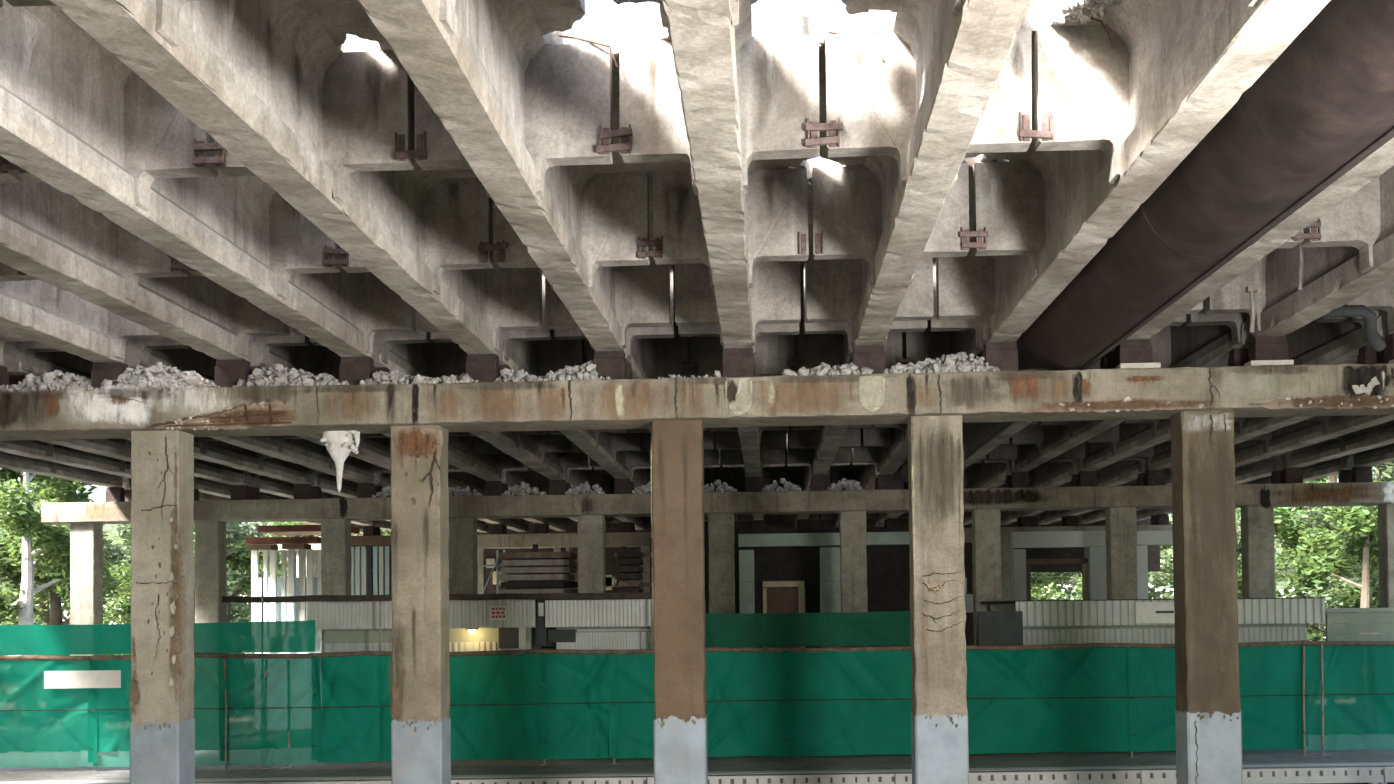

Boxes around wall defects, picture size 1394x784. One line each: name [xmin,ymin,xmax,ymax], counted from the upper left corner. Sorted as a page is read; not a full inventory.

spalling [1050,0,1122,49]
spalling [153,400,299,430]
spalling [1254,376,1394,409]
corrosion [1293,395,1394,407]
crack [422,442,441,507]
crack [136,581,179,659]
crack [922,572,962,632]